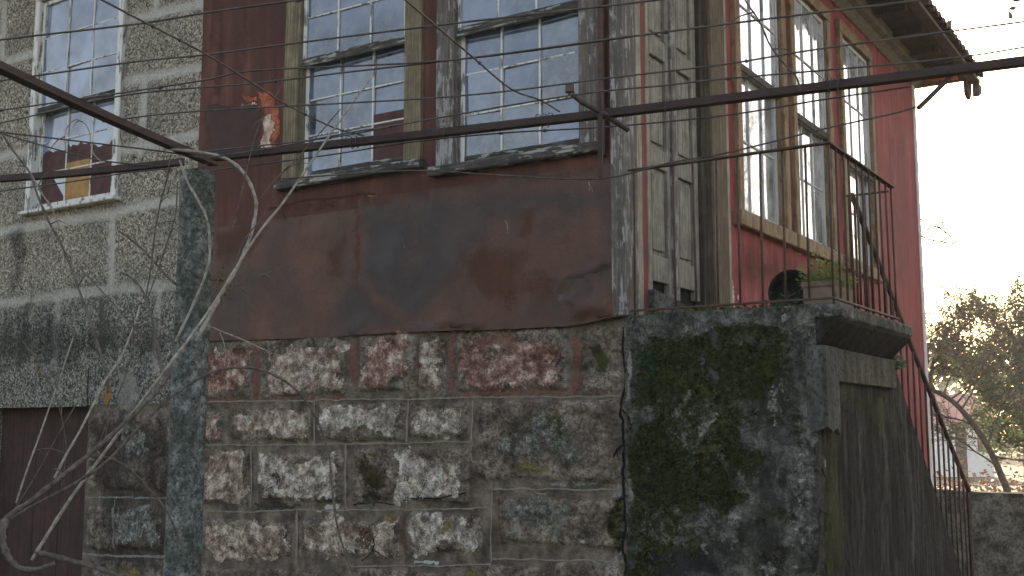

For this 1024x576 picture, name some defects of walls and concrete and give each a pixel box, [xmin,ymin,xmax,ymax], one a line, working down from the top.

peeling [242,91,280,148]
crack [613,327,632,576]